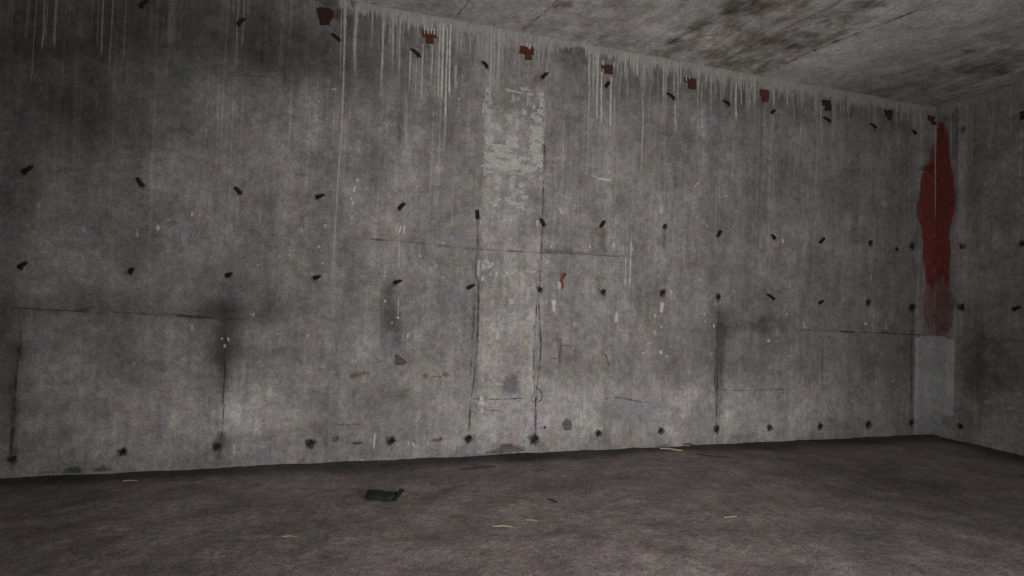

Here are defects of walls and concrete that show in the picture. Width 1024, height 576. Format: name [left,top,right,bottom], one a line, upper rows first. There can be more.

water stain [336,0,1024,289]